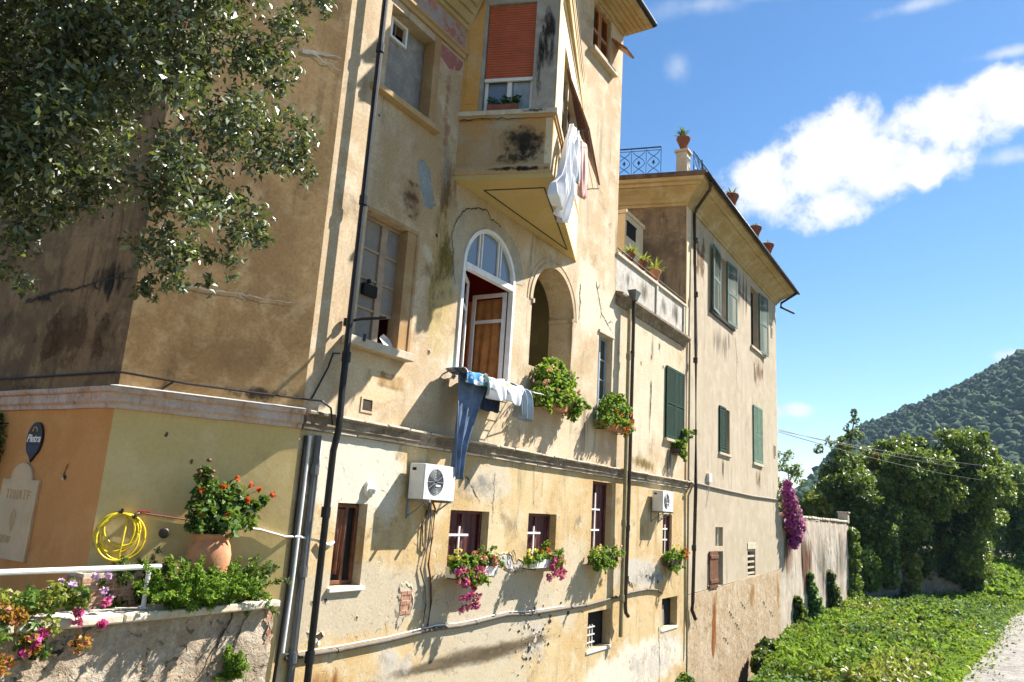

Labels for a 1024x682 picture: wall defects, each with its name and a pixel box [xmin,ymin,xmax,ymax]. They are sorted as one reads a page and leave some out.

crack [302,48,343,71]
water stain [538,14,555,89]
water stain [499,131,540,171]
peeling [415,156,437,214]
crack [452,207,501,284]
water stain [92,263,124,300]
crack [190,285,309,306]
water stain [33,310,109,364]
flaking render [395,581,414,630]